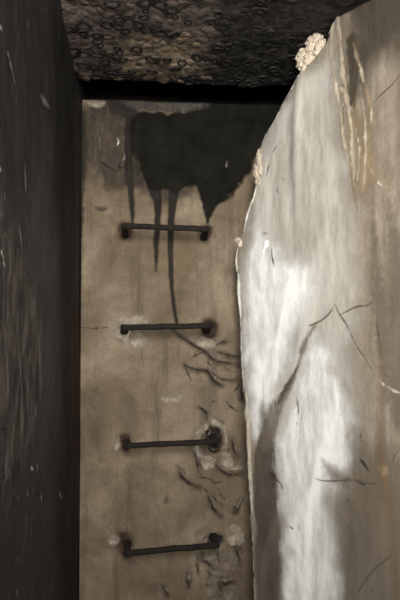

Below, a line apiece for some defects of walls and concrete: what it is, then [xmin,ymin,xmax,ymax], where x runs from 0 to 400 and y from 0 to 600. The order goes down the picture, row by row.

spalling [234,237,245,325]
water stain [82,0,400,600]
crack [309,303,371,355]
crack [180,337,244,512]
spalling [194,382,253,514]
crack [187,553,233,586]